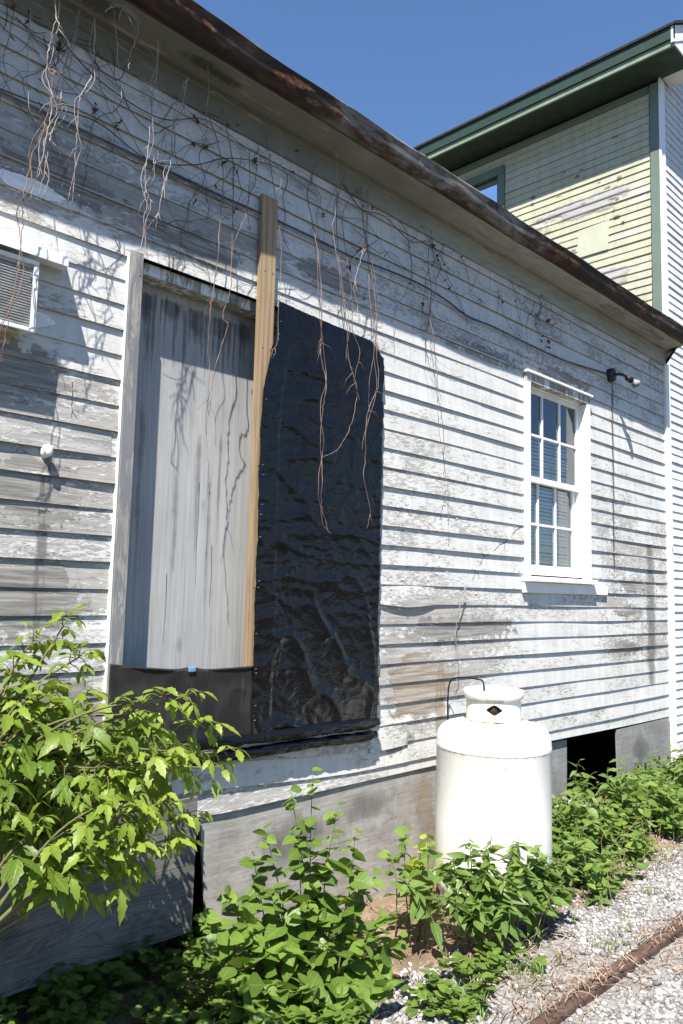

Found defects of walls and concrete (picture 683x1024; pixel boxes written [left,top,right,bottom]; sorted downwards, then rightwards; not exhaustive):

corrosion [272,70,344,118]
peeling [0,137,243,273]
peeling [35,312,57,328]
peeling [0,338,84,405]
peeling [536,367,608,400]
peeling [0,445,94,536]
peeling [0,546,92,645]
peeling [609,577,658,623]
peeling [612,639,643,657]